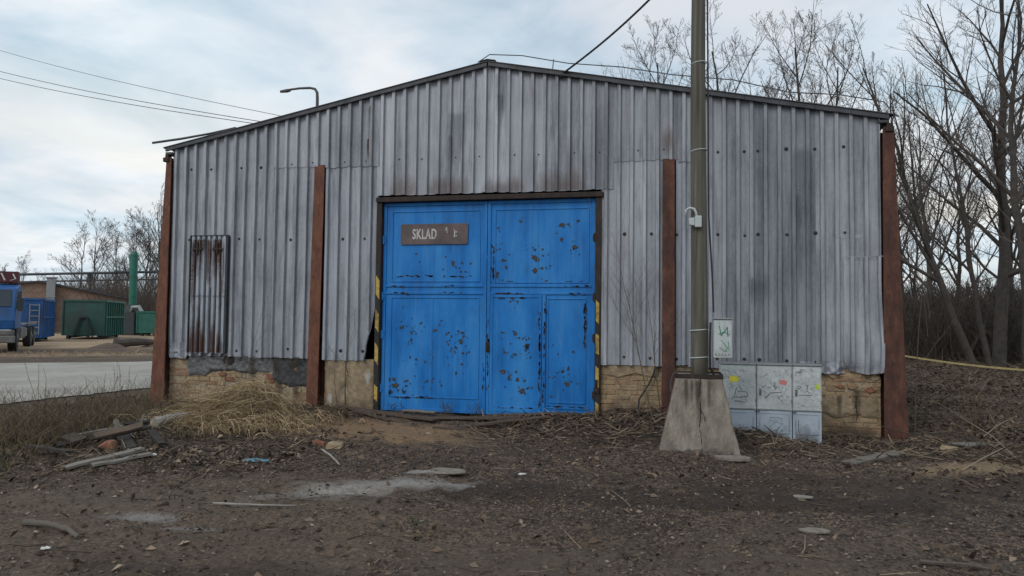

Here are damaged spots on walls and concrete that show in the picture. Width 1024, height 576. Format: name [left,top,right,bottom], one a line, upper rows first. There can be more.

corrosion [191,239,224,291]
peeling [393,253,472,308]
peeling [491,227,525,308]
peeling [565,281,589,353]
flaking render [186,355,307,387]
peeling [388,318,470,398]
peeling [482,302,584,409]